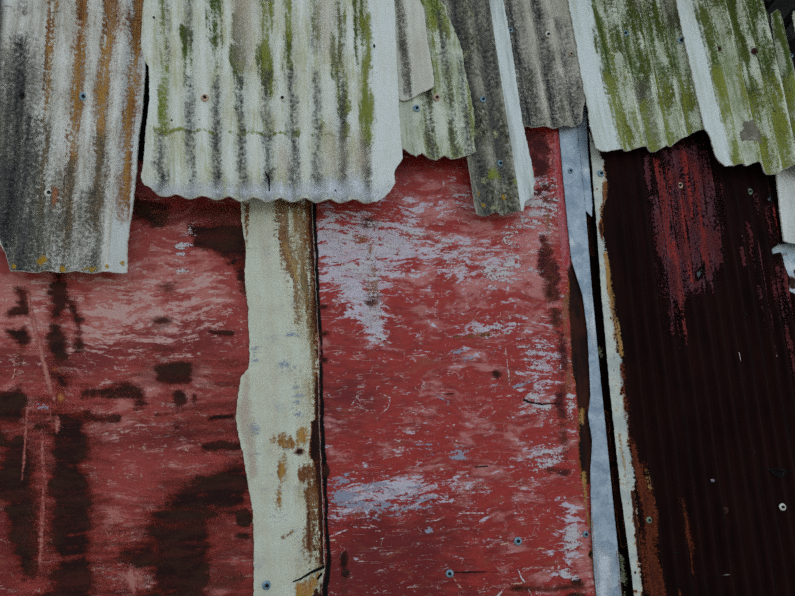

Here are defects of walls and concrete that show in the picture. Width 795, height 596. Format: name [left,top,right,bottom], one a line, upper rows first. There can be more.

rust [35,0,250,294]
damp [205,0,248,199]
damp [330,0,367,187]
peeling [434,173,561,290]
damp [505,0,581,128]
damp [603,0,698,151]
peeling [643,140,724,349]
rust [0,263,121,596]
rust [120,464,252,596]
rust [270,199,349,596]
peeling [323,472,435,522]
peeling [473,320,563,369]